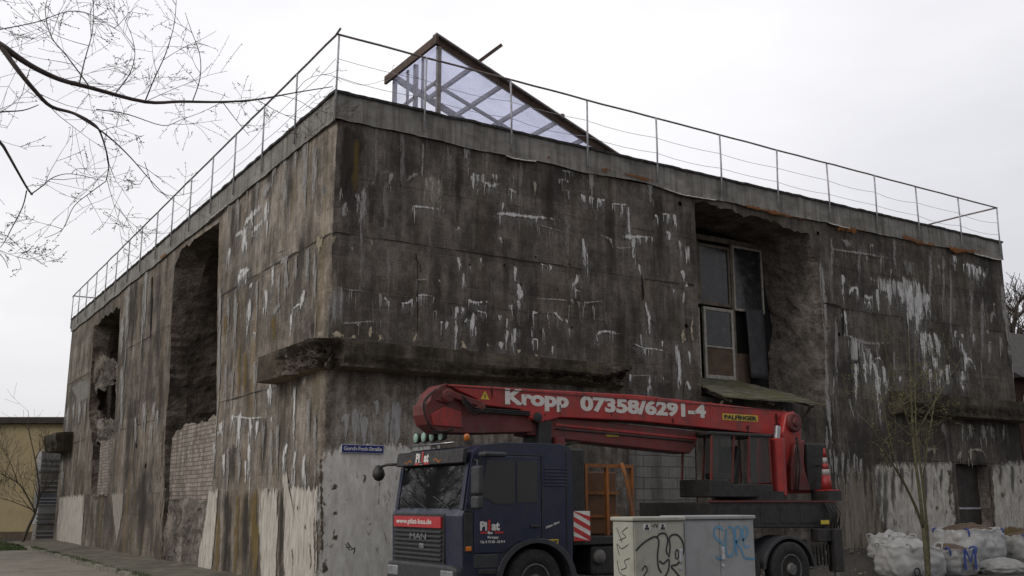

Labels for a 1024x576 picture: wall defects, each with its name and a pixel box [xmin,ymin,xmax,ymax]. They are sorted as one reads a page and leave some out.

water stain [464,148,560,242]
water stain [559,170,653,273]
water stain [647,184,690,303]
water stain [819,239,1014,549]